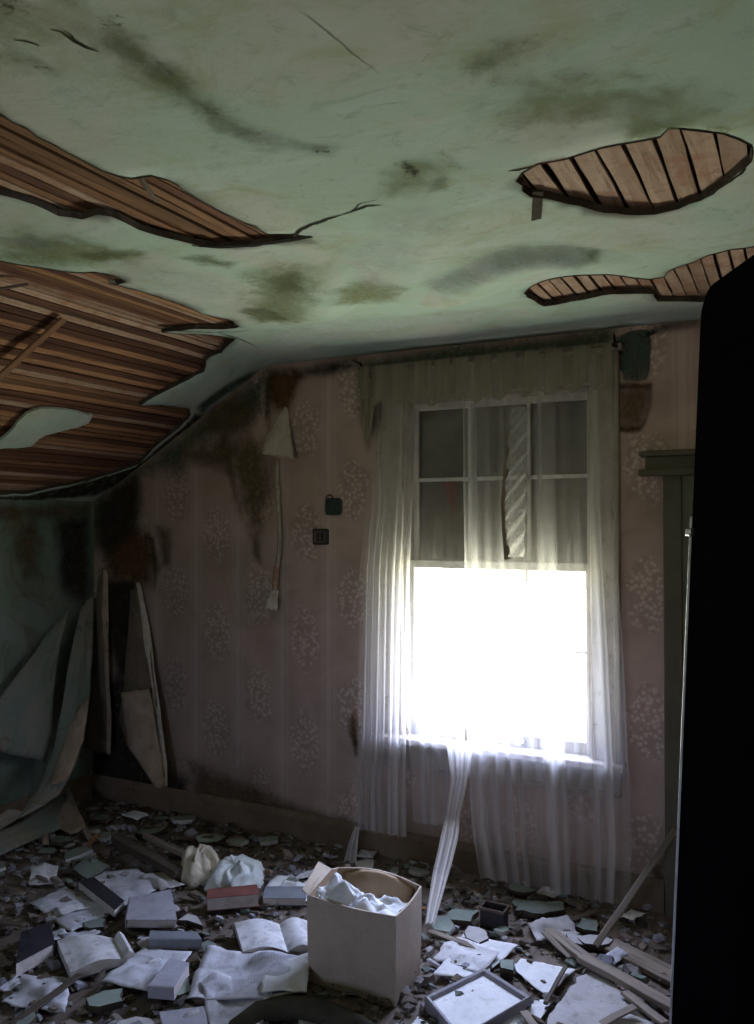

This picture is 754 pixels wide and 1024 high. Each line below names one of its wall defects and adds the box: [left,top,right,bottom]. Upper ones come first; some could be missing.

crack [300,12,373,69]
flaking render [0,114,310,249]
crack [192,200,381,248]
flaking render [516,128,754,221]
water stain [246,274,312,322]
flaking render [524,246,754,307]
flaking render [0,261,239,495]
water stain [0,373,269,633]
peeling [93,582,185,790]